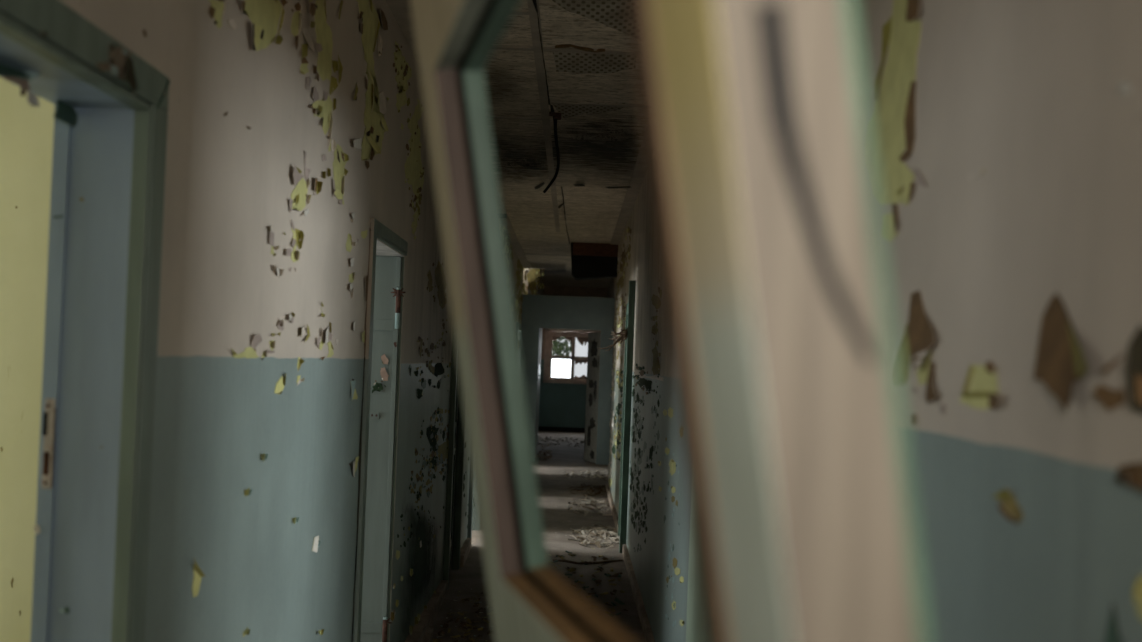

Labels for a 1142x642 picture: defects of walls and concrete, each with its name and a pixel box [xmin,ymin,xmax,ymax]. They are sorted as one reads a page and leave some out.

peeling [208,0,389,299]
peeling [870,0,927,242]
peeling [231,302,338,361]
peeling [274,357,305,395]
peeling [585,226,681,552]
peeling [898,290,1001,415]
peeling [1034,293,1142,412]
peeling [397,407,450,548]
peeling [192,558,205,597]